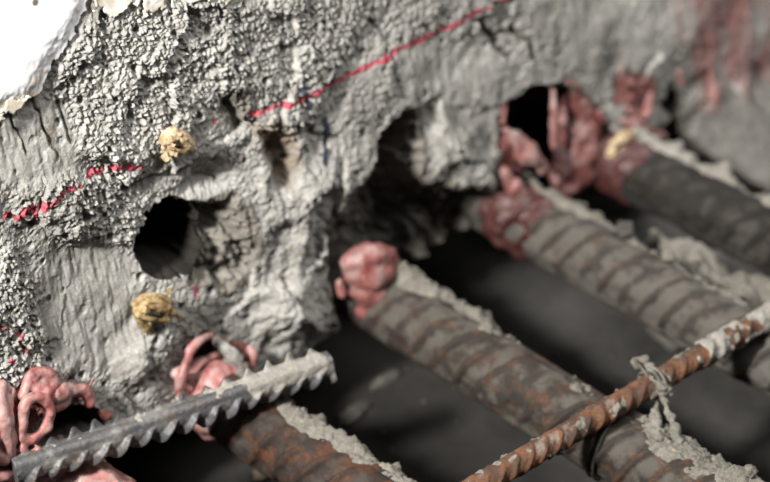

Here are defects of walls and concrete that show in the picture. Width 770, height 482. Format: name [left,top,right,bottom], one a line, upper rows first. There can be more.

crack [368,4,387,44]
crack [473,16,536,62]
peeling [0,95,32,122]
spalling [11,0,366,246]
spalling [680,55,770,193]